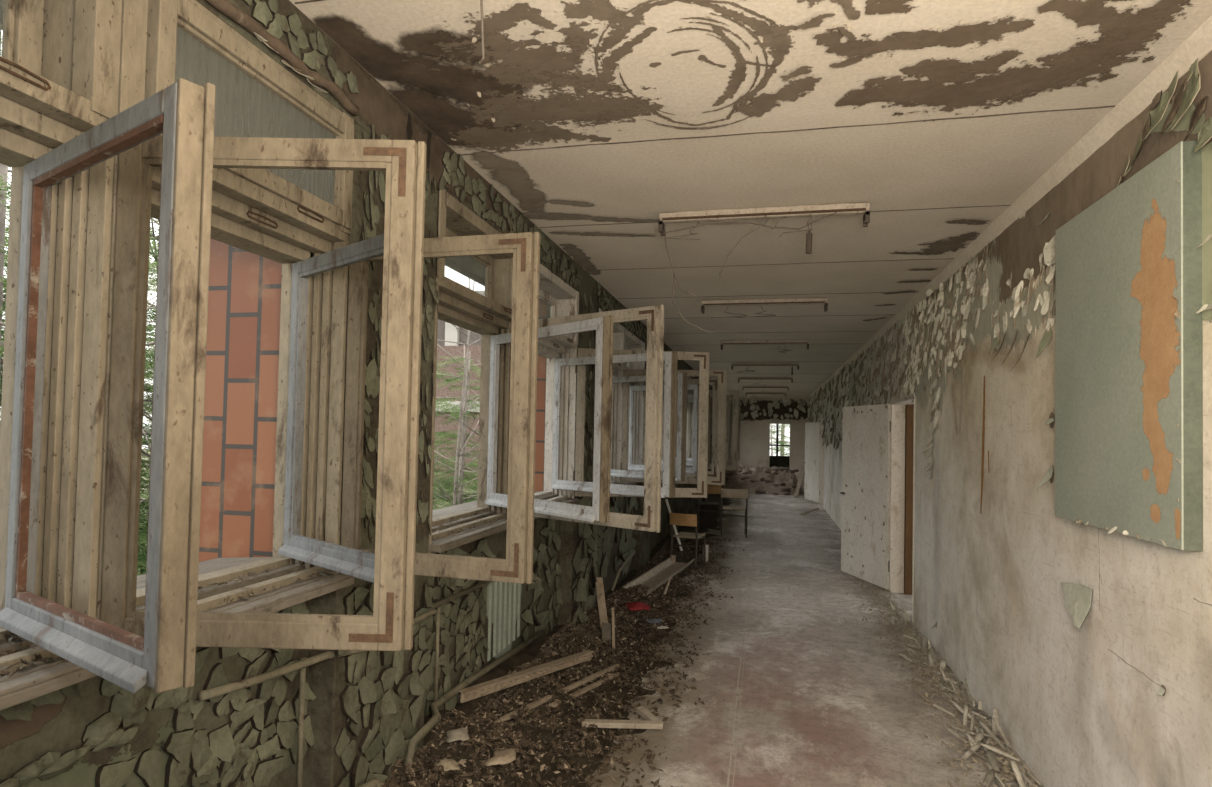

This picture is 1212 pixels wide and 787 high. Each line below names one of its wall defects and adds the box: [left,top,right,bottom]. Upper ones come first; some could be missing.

peeling [242,0,1194,343]
spalling [730,51,1212,480]
peeling [576,364,595,507]
peeling [1131,198,1181,548]
peeling [274,601,310,614]
peeling [1061,582,1093,628]
spalling [0,683,82,749]
peeling [21,647,316,787]